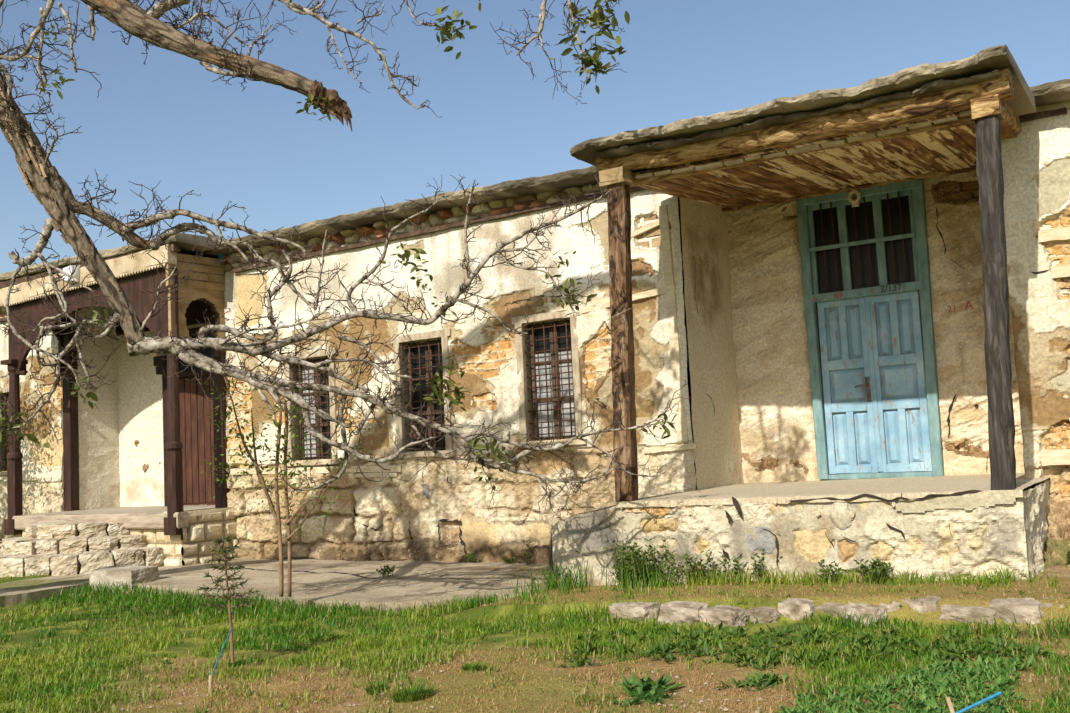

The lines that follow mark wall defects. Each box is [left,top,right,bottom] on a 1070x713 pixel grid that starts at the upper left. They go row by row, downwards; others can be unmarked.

flaking render [932,180,979,207]
crack [936,207,965,269]
flaking render [1031,152,1070,300]
flaking render [233,273,269,329]
flaking render [450,323,514,379]
flaking render [580,322,613,408]
flaking render [1050,346,1070,398]
flaking render [742,453,809,474]
crack [947,395,957,440]
flaking render [942,438,989,458]
flaking render [1036,418,1070,450]
flaking render [1036,464,1070,504]